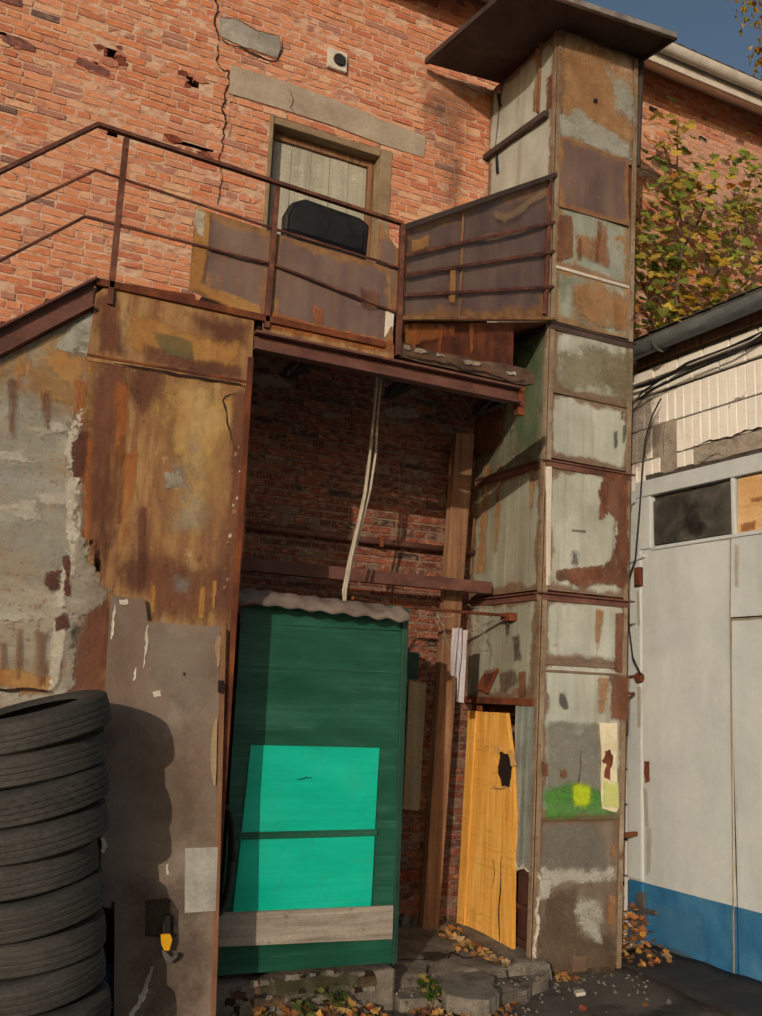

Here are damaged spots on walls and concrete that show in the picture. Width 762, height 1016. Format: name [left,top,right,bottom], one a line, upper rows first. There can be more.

crack [214,0,283,204]
corrosion [533,46,634,145]
corrosion [190,207,389,351]
corrosion [556,214,609,266]
corrosion [44,555,71,596]
peeling [48,408,113,693]
corrosion [0,296,247,566]
corrosion [116,382,245,620]
corrosion [553,473,629,588]
peeling [691,427,762,465]
corrosion [598,613,630,719]
peeling [532,826,614,959]